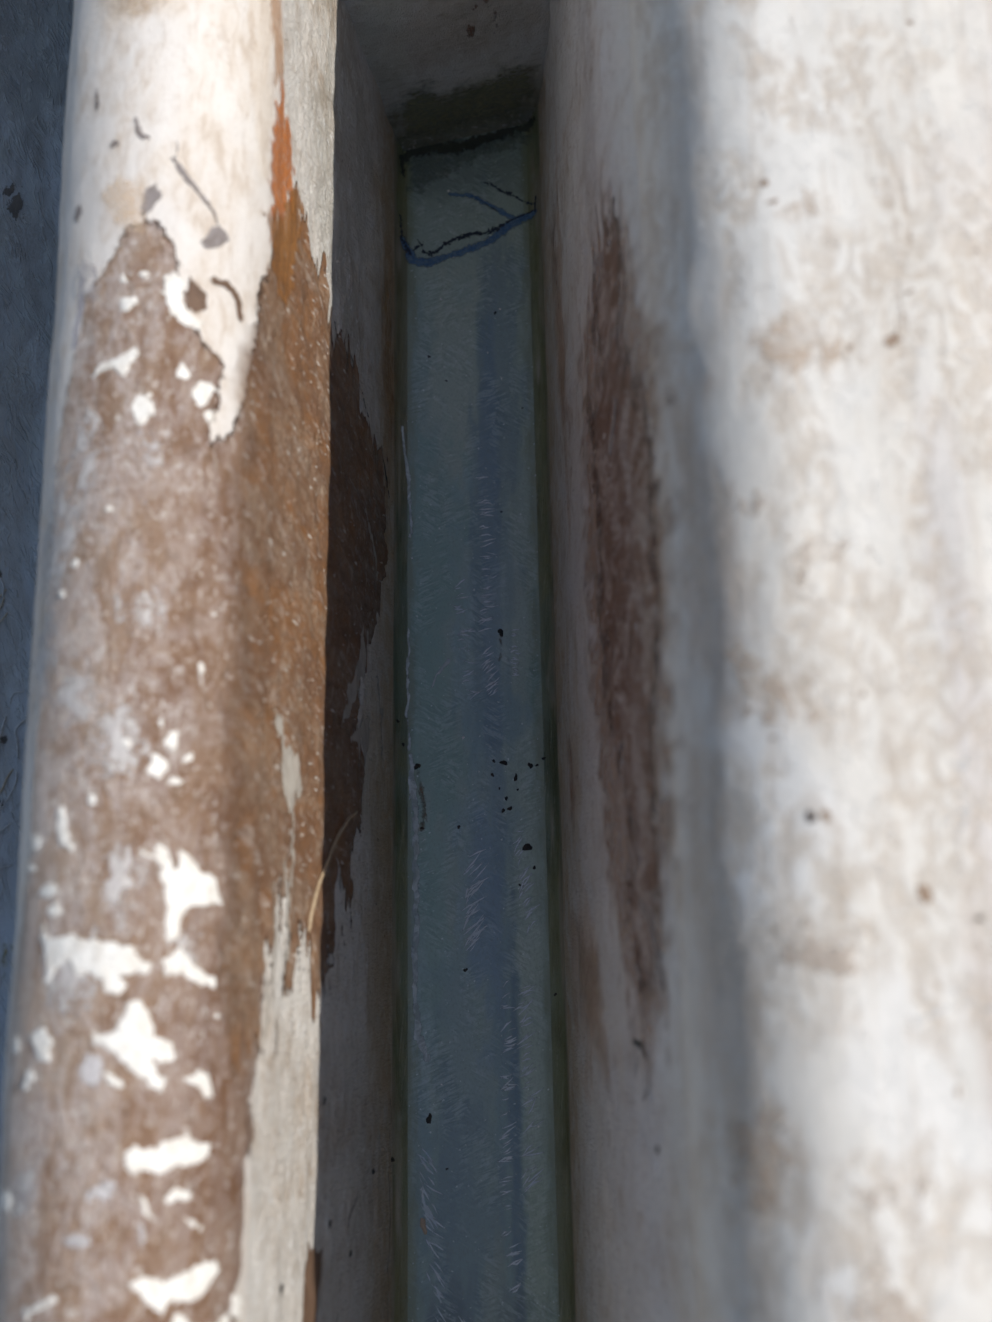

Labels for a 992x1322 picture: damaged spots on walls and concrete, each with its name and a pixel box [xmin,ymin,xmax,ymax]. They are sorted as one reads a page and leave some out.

peeling [0,185,389,1322]
rust [264,72,305,305]